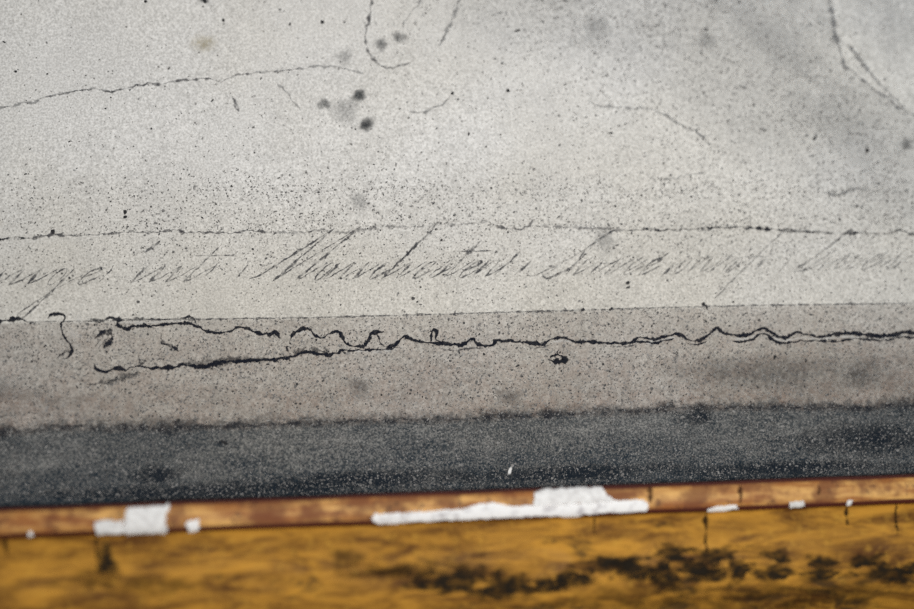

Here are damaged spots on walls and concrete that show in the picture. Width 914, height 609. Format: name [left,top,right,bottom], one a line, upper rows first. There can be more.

crack [365,0,408,68]
crack [0,312,914,385]